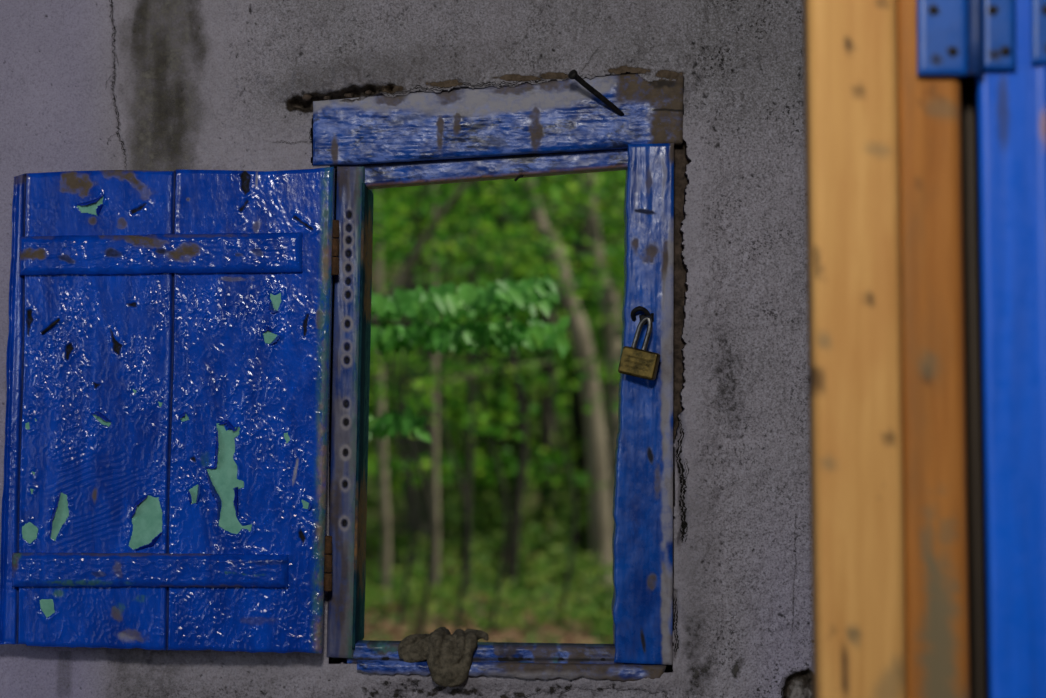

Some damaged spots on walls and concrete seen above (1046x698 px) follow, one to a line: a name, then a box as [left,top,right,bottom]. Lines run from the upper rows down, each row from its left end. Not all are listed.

crack [106,0,127,168]
leakage [132,0,195,171]
flaking render [286,72,591,113]
flaking render [608,65,683,80]
peeling [76,194,104,216]
peeling [268,293,281,313]
peeling [263,326,280,345]
peeling [187,420,252,534]
peeling [22,491,69,544]
peeling [128,495,162,551]
peeling [39,599,55,618]
flaking render [781,669,814,698]